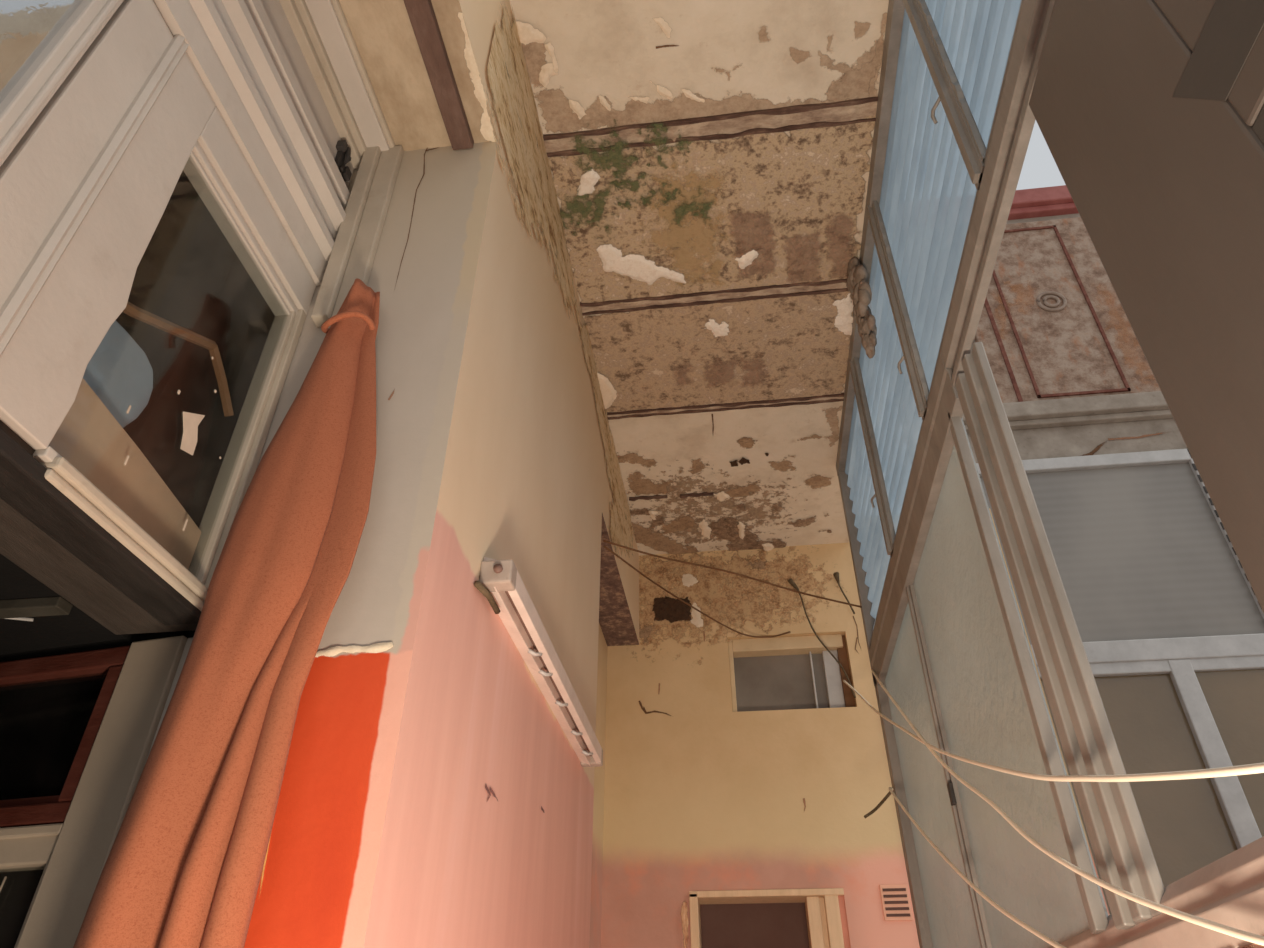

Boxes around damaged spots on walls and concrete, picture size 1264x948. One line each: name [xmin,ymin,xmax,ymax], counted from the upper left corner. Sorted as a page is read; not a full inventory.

peeling [458,7,887,556]
spalling [652,596,691,623]